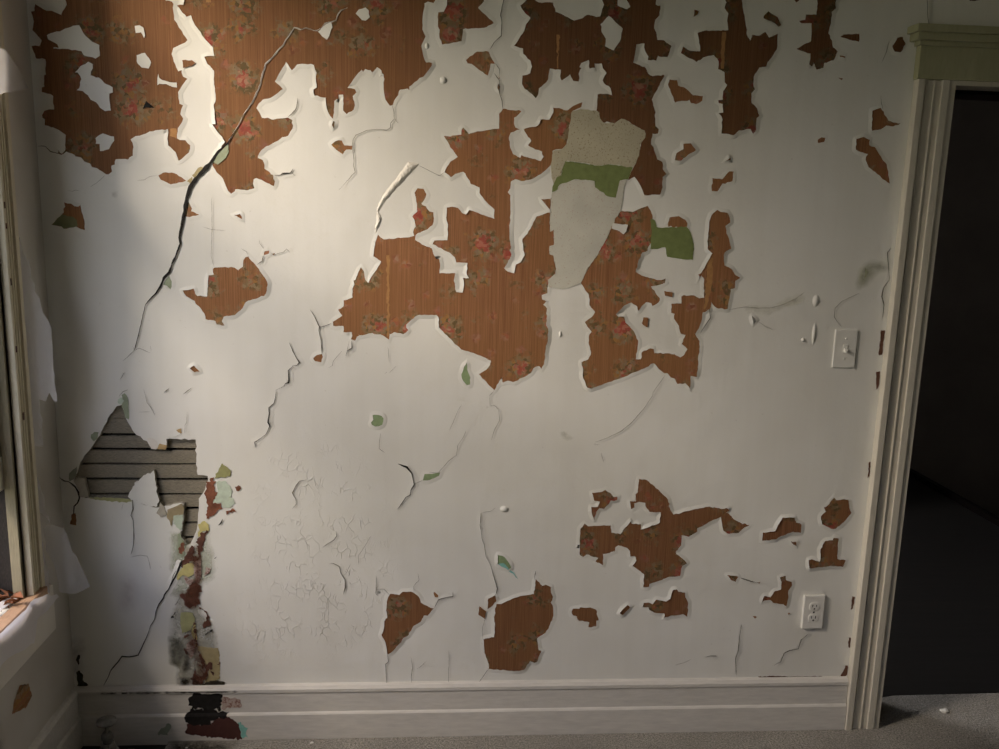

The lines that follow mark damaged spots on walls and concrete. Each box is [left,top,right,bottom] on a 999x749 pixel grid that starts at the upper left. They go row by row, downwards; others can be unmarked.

peeling [793,0,863,73]
crack [120,8,346,413]
peeling [27,0,781,394]
flaking render [67,393,208,553]
crack [100,499,182,686]
leakage [108,464,241,694]
crack [219,308,466,683]
peeling [378,588,441,657]
crack [476,508,502,595]
peeling [478,576,602,674]
peeling [576,476,804,620]
peeling [805,494,855,572]